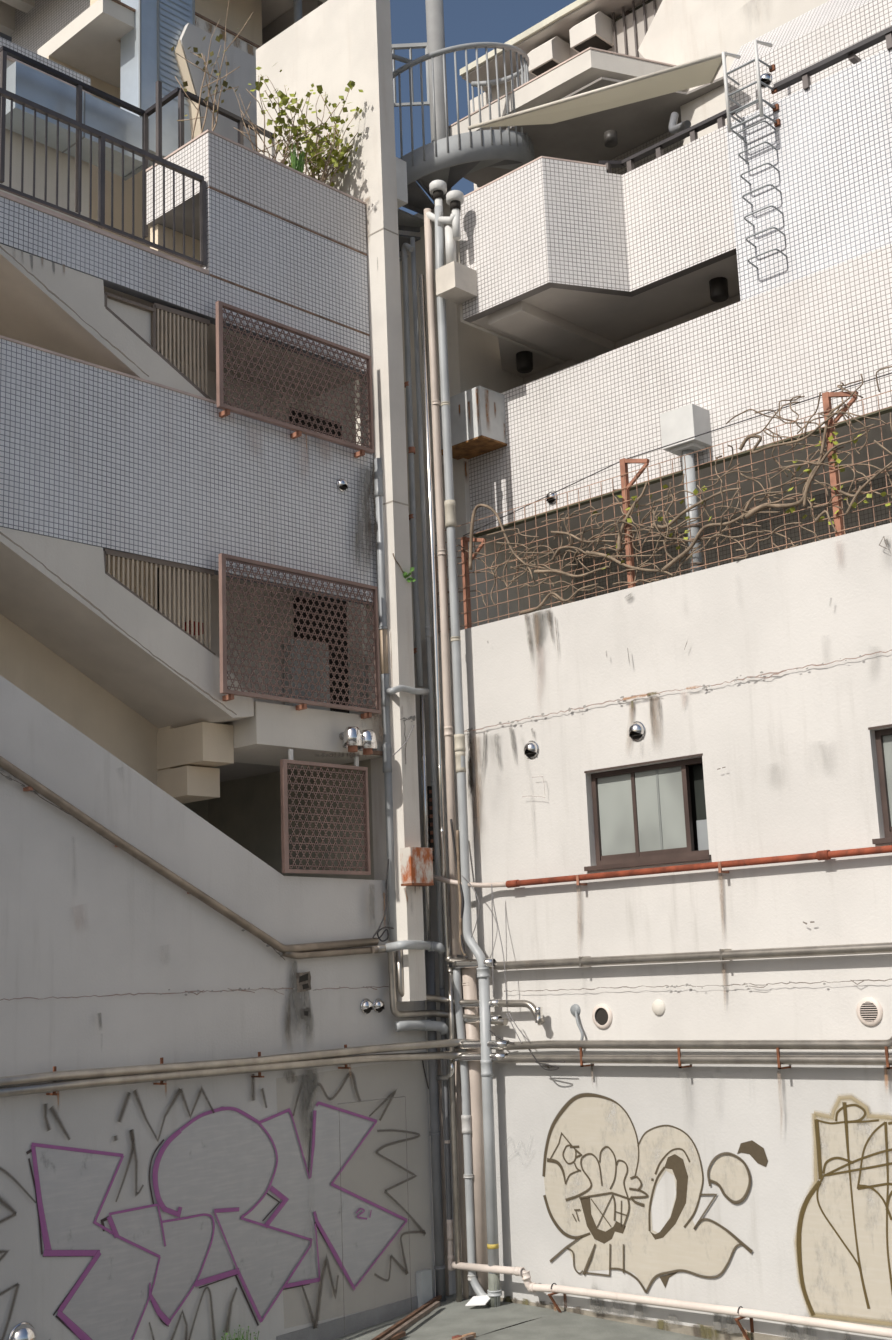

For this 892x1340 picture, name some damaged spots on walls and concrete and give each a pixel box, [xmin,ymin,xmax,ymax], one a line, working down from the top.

damp [525,610,557,646]